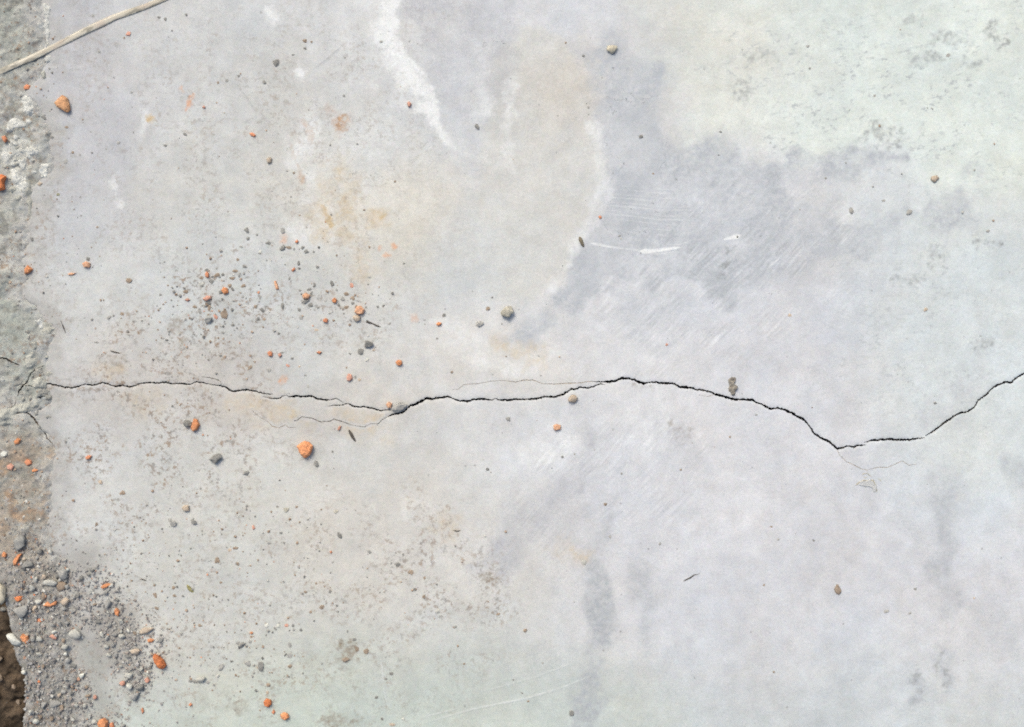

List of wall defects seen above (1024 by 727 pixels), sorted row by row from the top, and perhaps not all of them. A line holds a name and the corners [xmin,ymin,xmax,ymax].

crack [0,357,1024,471]